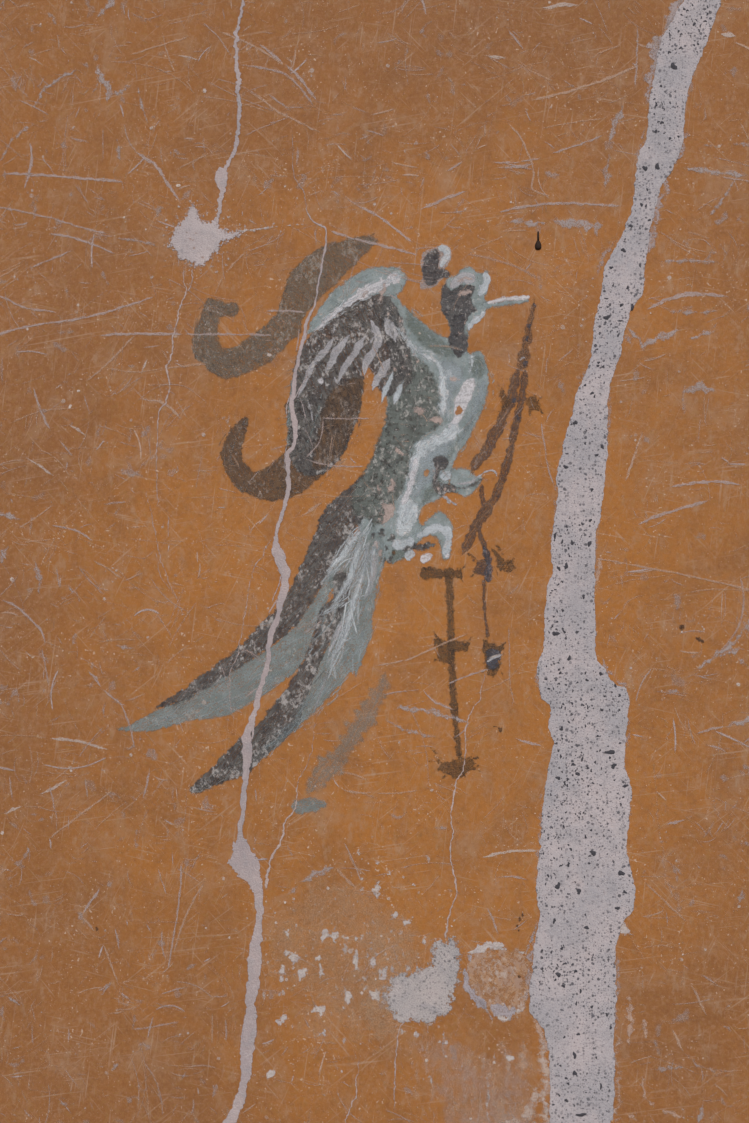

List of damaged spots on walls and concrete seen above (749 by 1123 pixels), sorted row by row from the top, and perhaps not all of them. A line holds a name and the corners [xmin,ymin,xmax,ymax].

crack [214,0,245,223]
crack [146,269,193,620]
crack [222,138,327,1123]
crack [526,0,721,1123]
peeling [279,946,324,995]
spalling [320,928,530,1034]